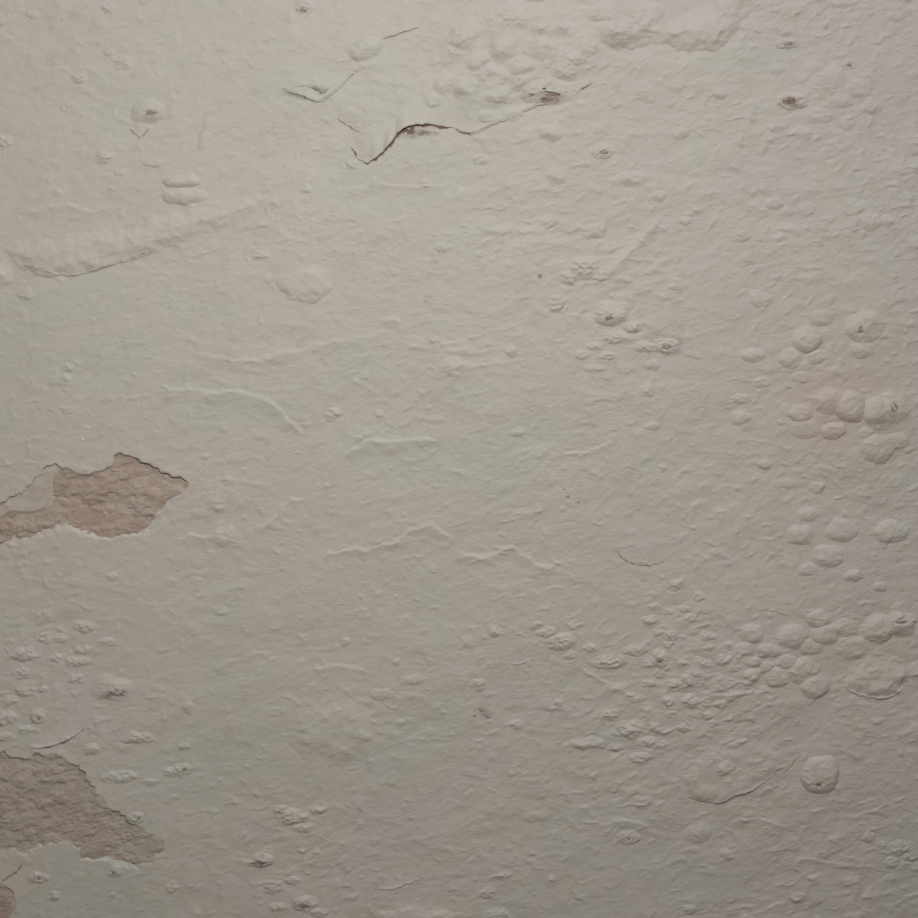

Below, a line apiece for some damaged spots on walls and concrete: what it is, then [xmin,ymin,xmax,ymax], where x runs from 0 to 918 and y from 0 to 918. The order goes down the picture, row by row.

peeling [0,443,192,544]
peeling [0,719,170,865]